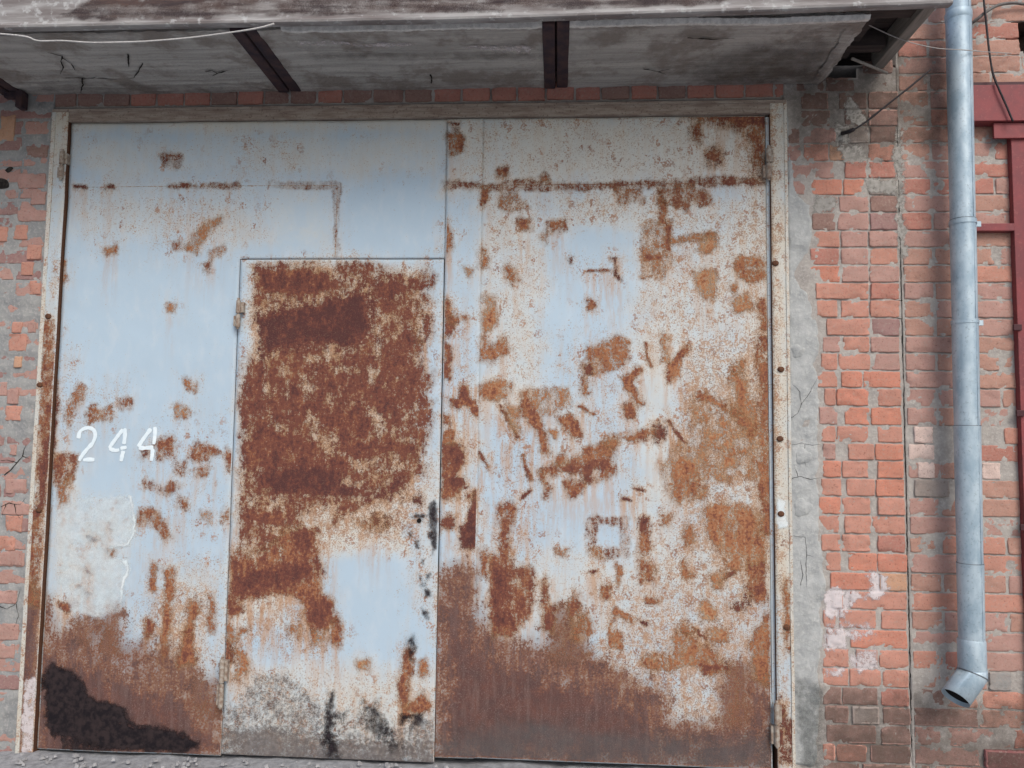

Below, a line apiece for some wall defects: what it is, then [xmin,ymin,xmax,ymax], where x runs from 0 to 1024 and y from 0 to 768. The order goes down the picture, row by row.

crack [47,52,143,93]
corrosion [160,153,182,168]
corrosion [172,215,226,270]
corrosion [444,116,766,279]
corrosion [20,254,793,768]
leakage [823,568,891,677]